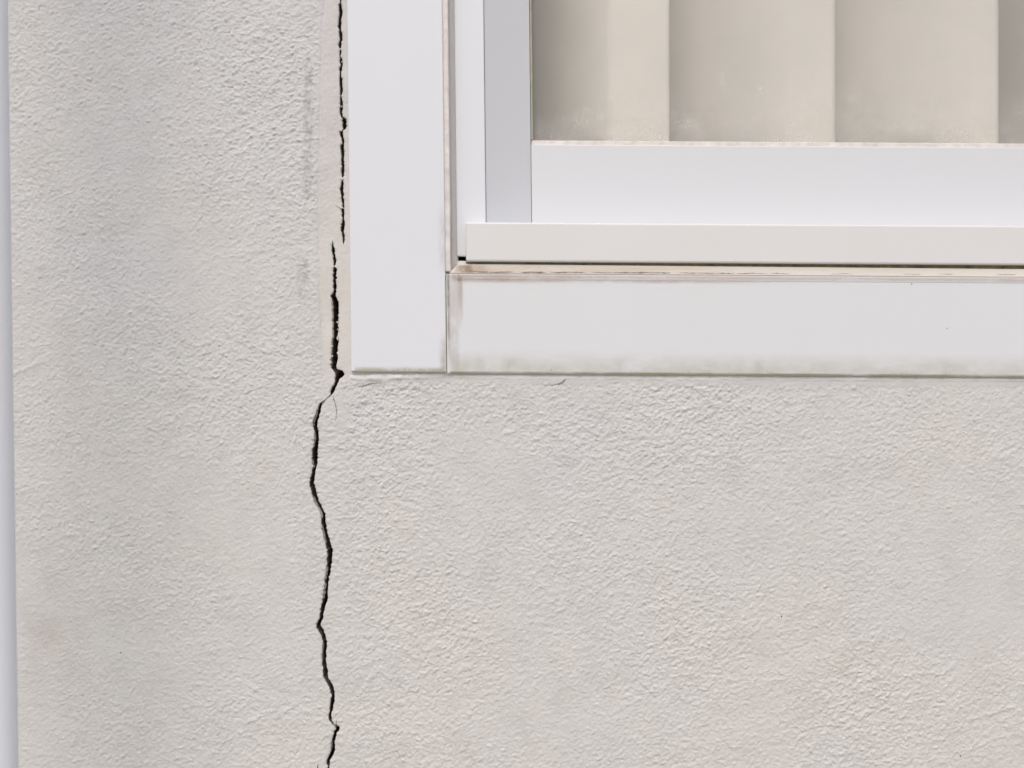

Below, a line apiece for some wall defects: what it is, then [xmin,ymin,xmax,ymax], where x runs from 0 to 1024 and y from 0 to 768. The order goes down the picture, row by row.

crack [310,0,347,768]